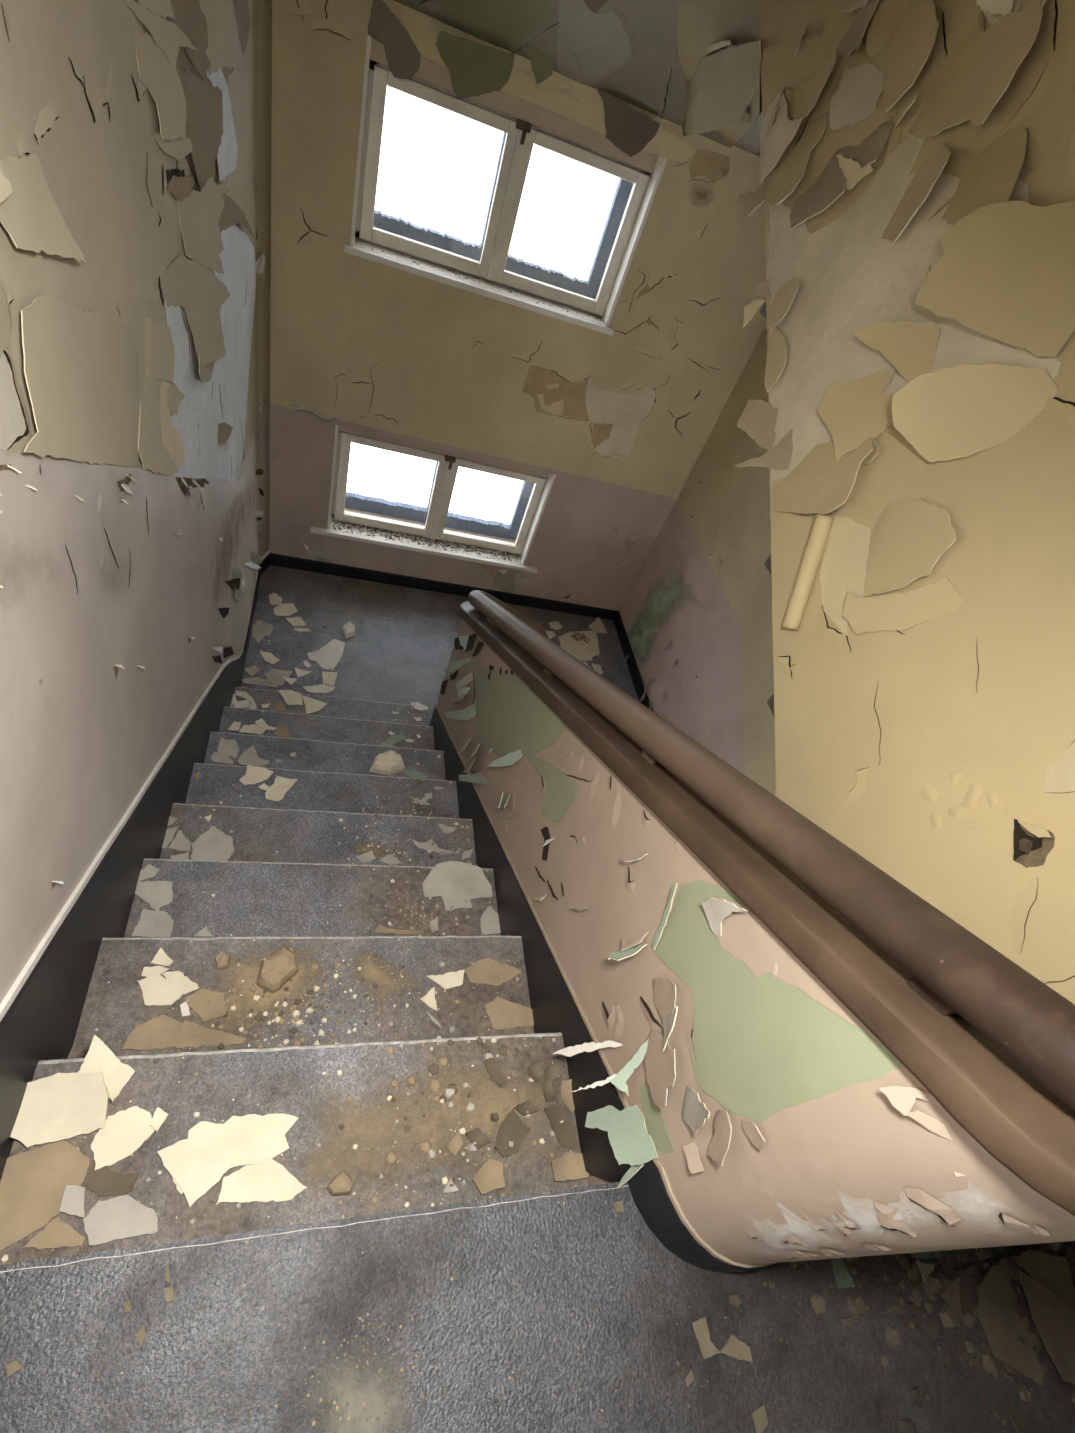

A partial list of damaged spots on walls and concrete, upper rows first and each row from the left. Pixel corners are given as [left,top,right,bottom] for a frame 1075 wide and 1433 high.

crack [1,2,11,42]
crack [17,49,148,156]
peeling [368,0,761,183]
peeling [0,0,265,536]
peeling [735,0,1075,654]
peeling [545,617,607,674]
peeling [379,634,589,911]
spalling [1013,819,1055,868]
crack [1011,878,1038,954]
peeling [420,958,534,1030]
peeling [446,880,953,1194]
crack [1044,975,1075,999]